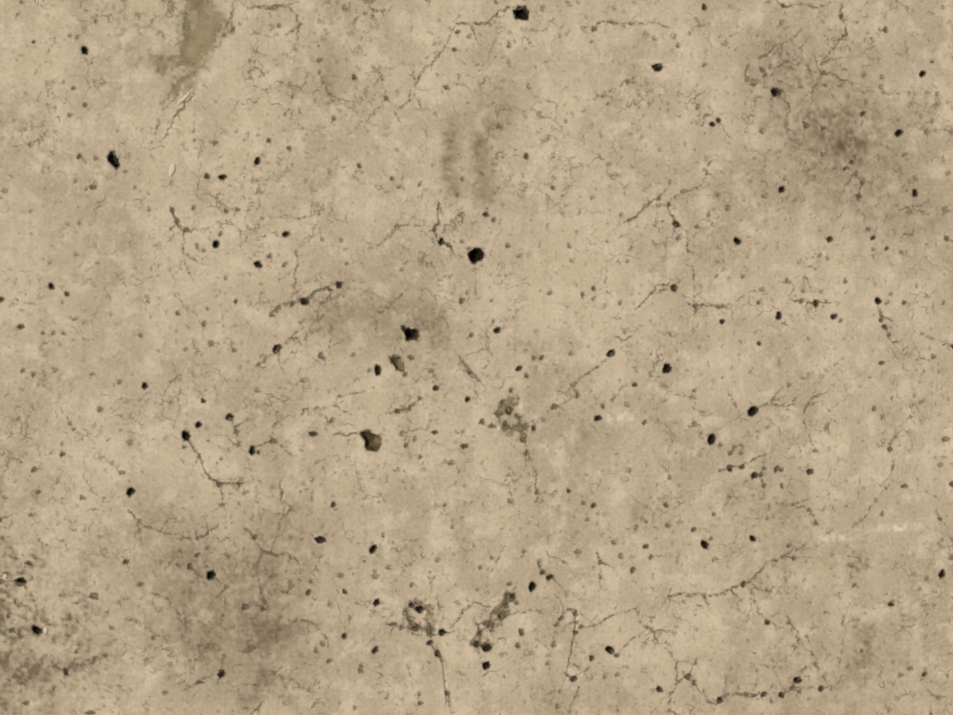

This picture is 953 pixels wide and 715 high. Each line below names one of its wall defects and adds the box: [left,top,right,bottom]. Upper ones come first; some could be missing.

crack [230,2,300,47]
crack [409,7,509,101]
crack [627,161,711,279]
crack [295,251,329,320]
crack [668,545,815,715]